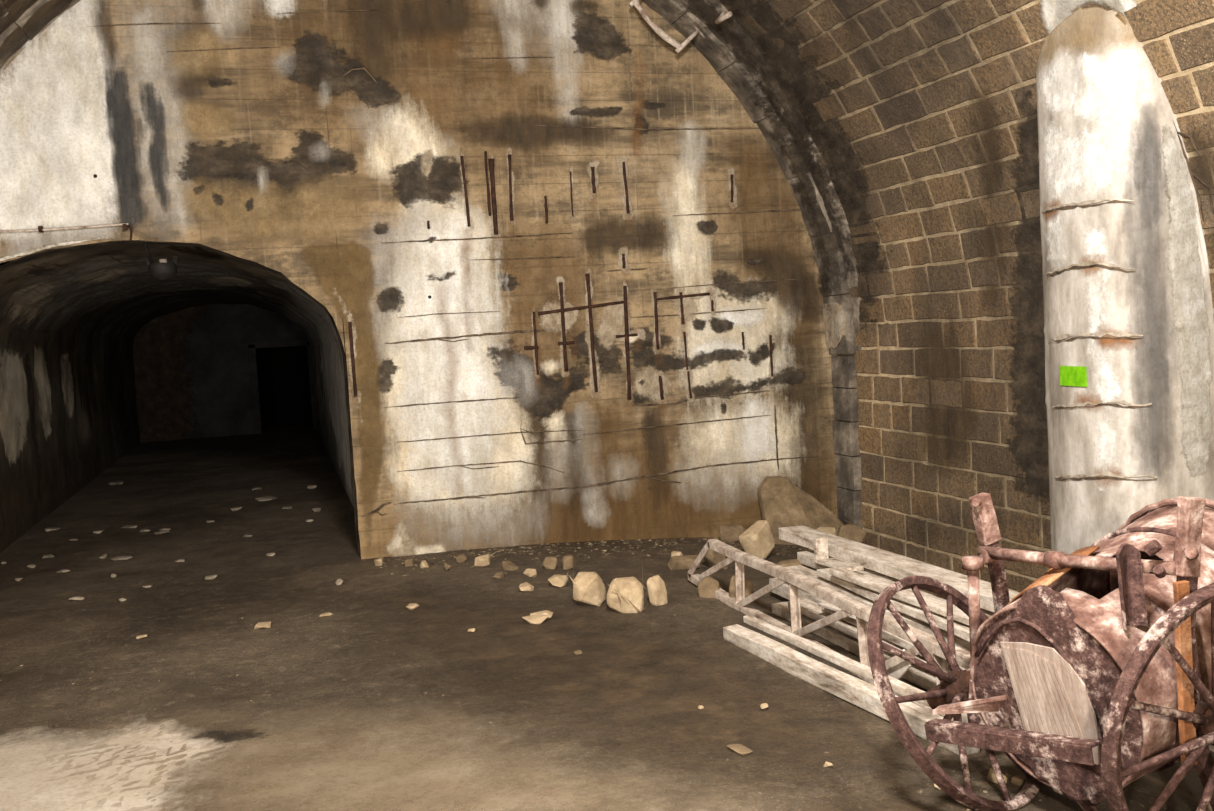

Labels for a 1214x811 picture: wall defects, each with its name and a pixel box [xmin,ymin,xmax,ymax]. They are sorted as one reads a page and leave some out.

corrosion [460,153,474,229]
corrosion [484,148,516,234]
corrosion [616,156,634,220]
crack [1042,199,1133,217]
water stain [0,0,824,547]
crack [1046,261,1135,276]
spalling [541,301,579,332]
spalling [597,298,638,348]
spalling [746,335,759,351]
crack [1048,332,1143,345]
spalling [635,366,672,402]
crack [1052,398,1152,409]